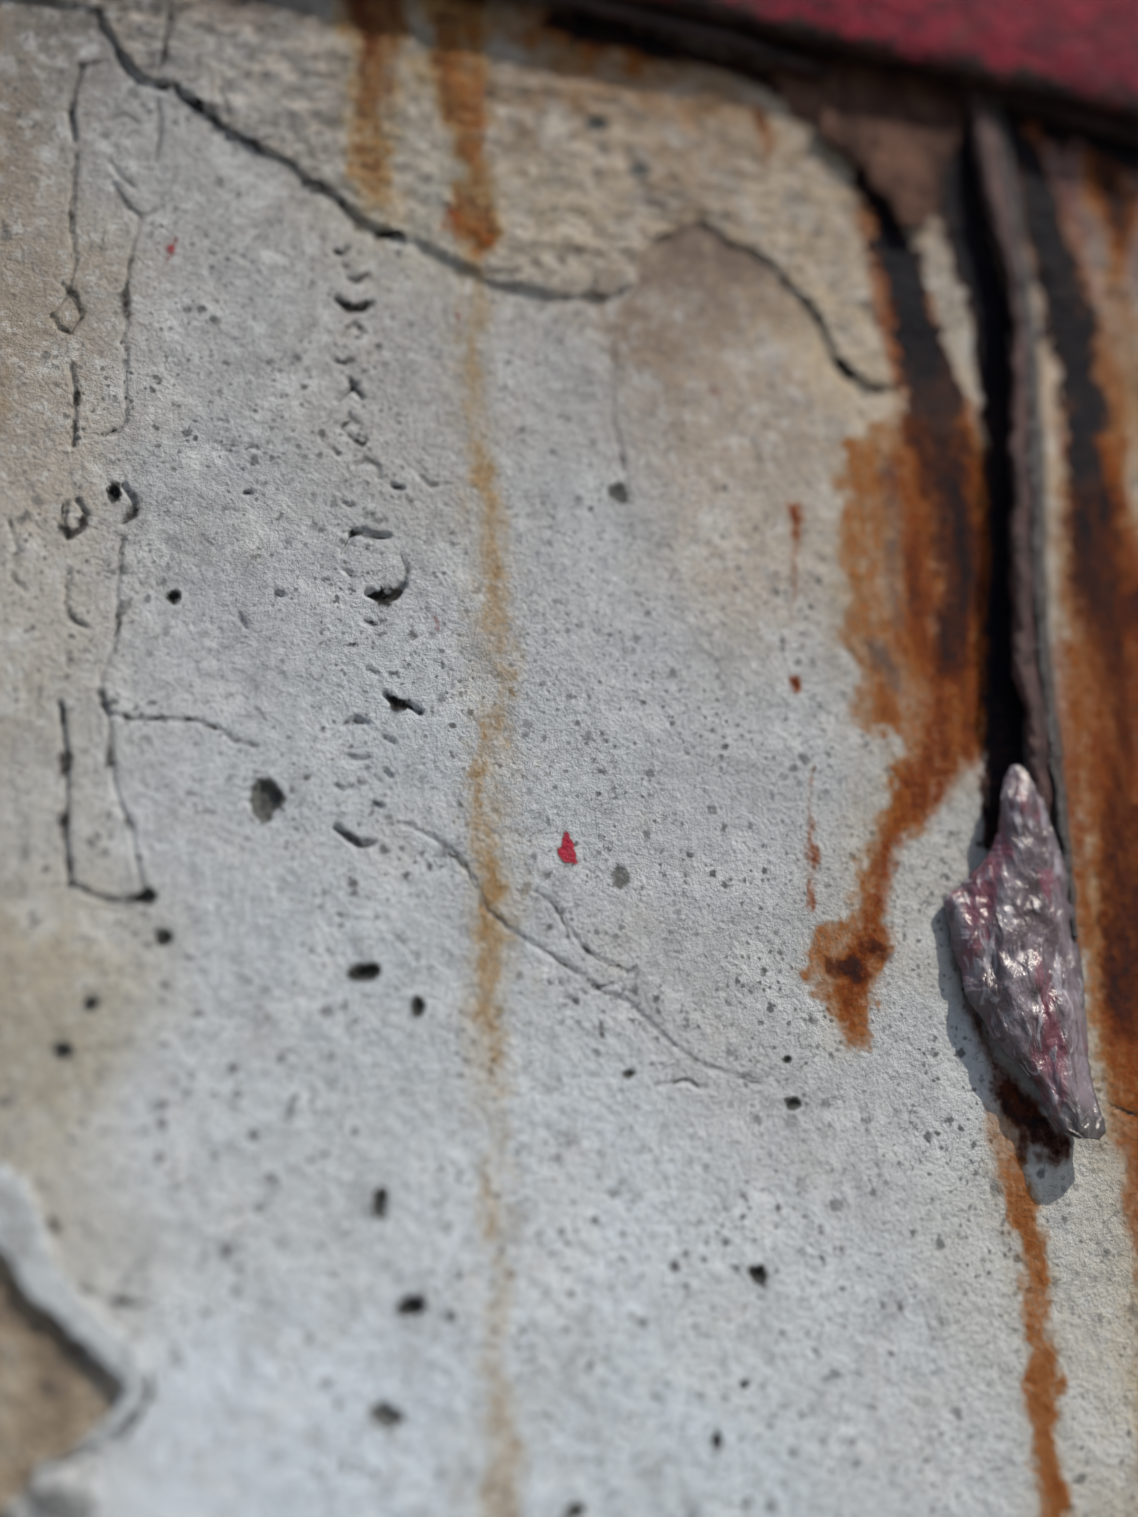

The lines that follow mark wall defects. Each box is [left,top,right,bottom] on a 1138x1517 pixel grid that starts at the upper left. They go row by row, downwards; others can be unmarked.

crack [96,1,404,240]
corrosion [335,0,503,258]
peeling [634,222,855,380]
corrosion [1081,152,1138,329]
corrosion [480,859,504,1027]
corrosion [801,410,991,1046]
peeling [770,55,1106,1140]
corrosion [1053,448,1138,1235]
spalling [0,1161,159,1517]
corrosion [965,1004,1071,1517]